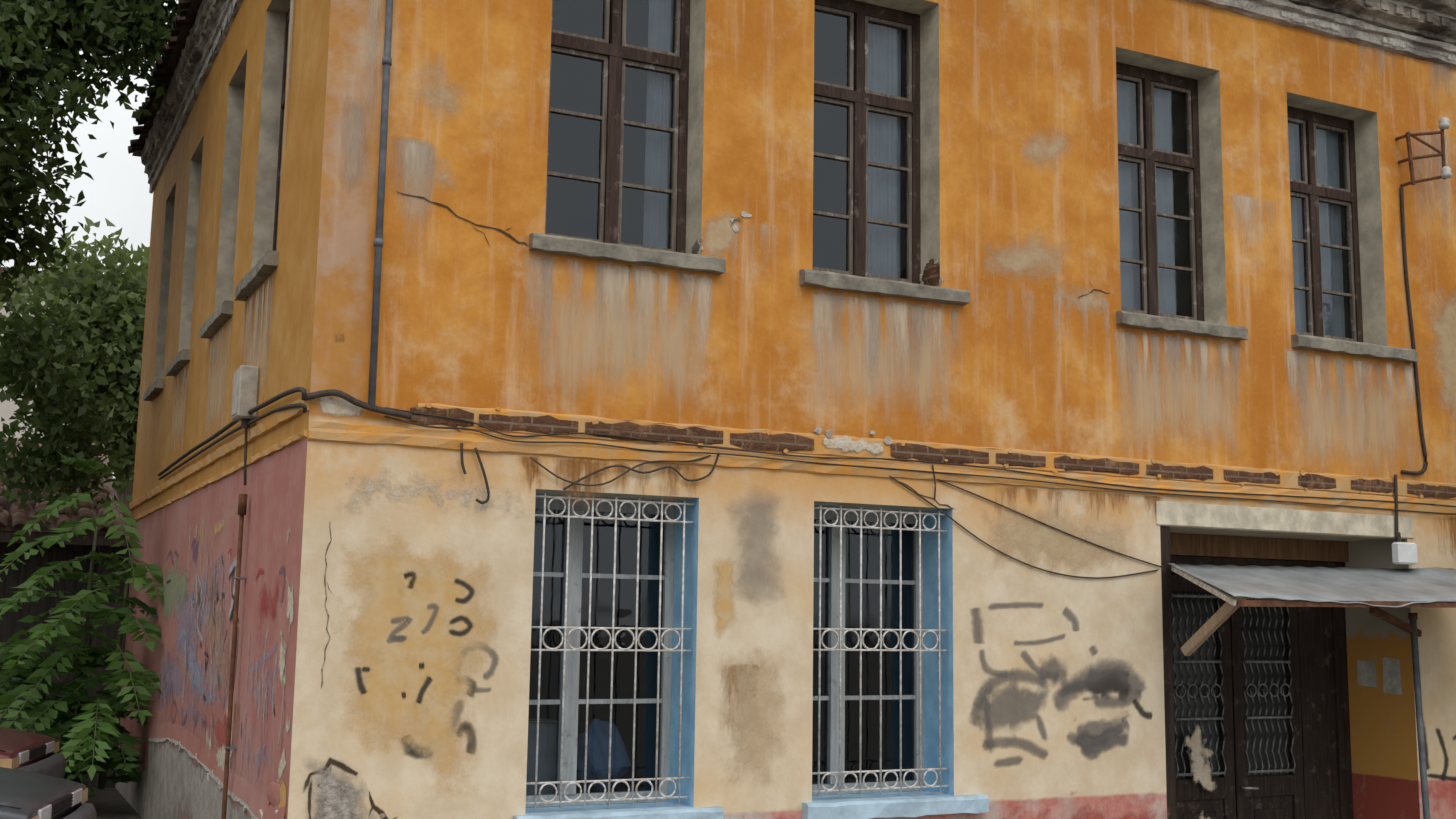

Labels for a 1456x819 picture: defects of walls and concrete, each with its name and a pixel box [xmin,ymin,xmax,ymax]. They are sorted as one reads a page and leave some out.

crack [398,192,529,246]
water stain [208,278,273,420]
water stain [531,258,711,385]
water stain [814,293,957,404]
water stain [1119,331,1238,431]